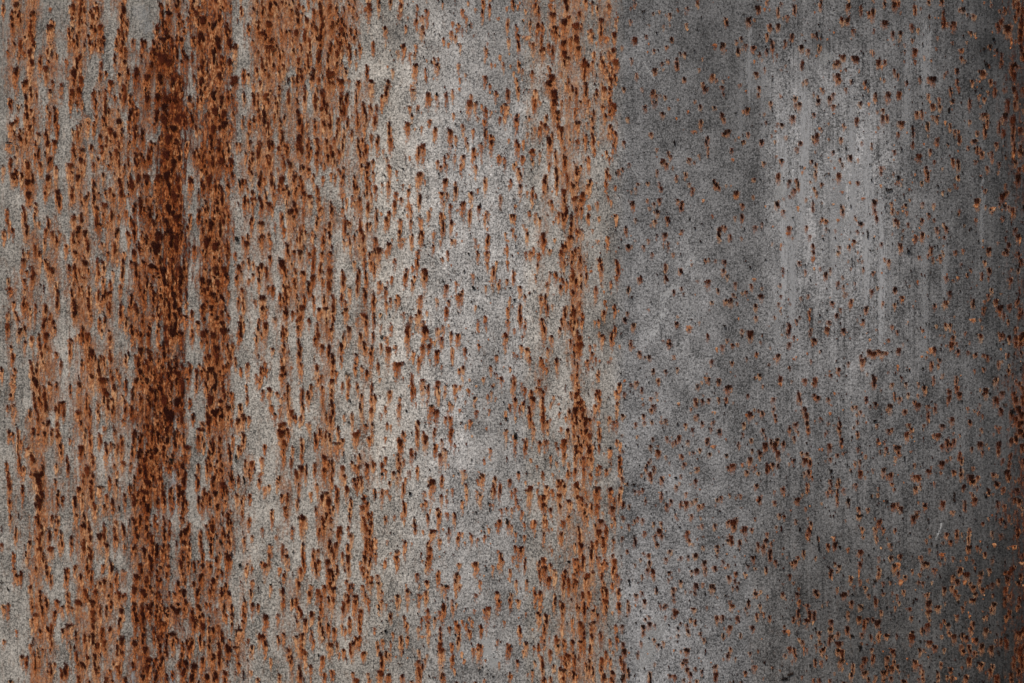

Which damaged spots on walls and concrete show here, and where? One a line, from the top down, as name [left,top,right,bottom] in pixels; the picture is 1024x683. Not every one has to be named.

rust [632,24,729,162]
rust [712,0,835,161]
rust [1,208,15,246]
rust [643,139,694,275]
rust [689,179,745,242]
rust [697,258,768,318]
rust [753,0,1024,683]
rust [661,419,716,484]
rust [675,328,906,537]
rust [1,460,23,586]